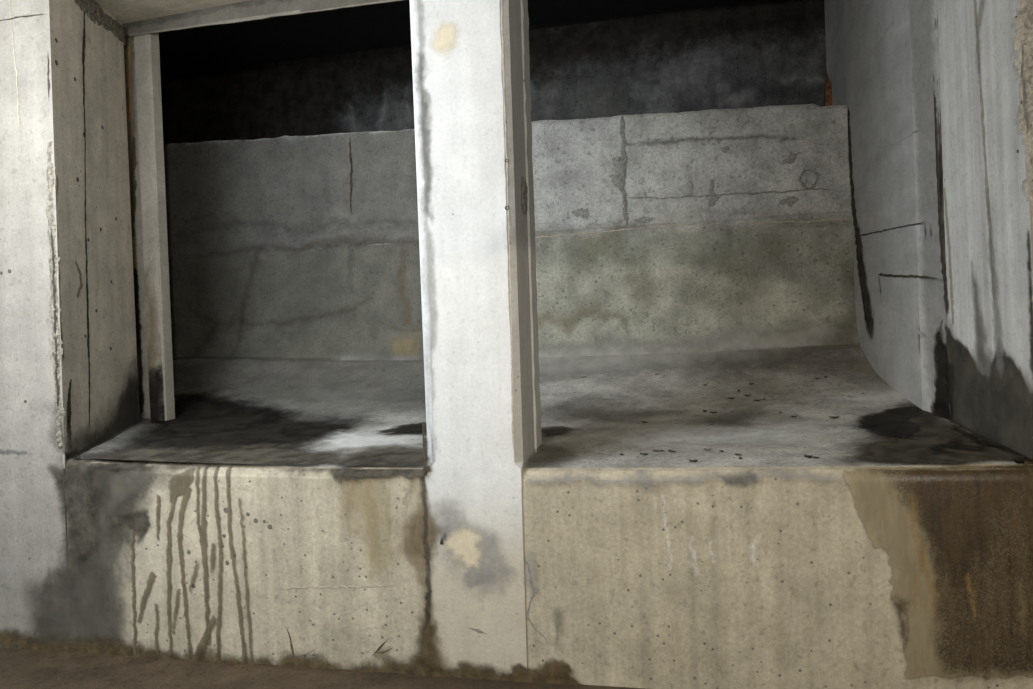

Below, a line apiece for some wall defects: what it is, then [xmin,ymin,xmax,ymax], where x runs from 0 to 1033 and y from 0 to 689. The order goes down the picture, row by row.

leakage [0,369,581,686]
leakage [607,413,795,443]
leakage [840,77,1033,465]